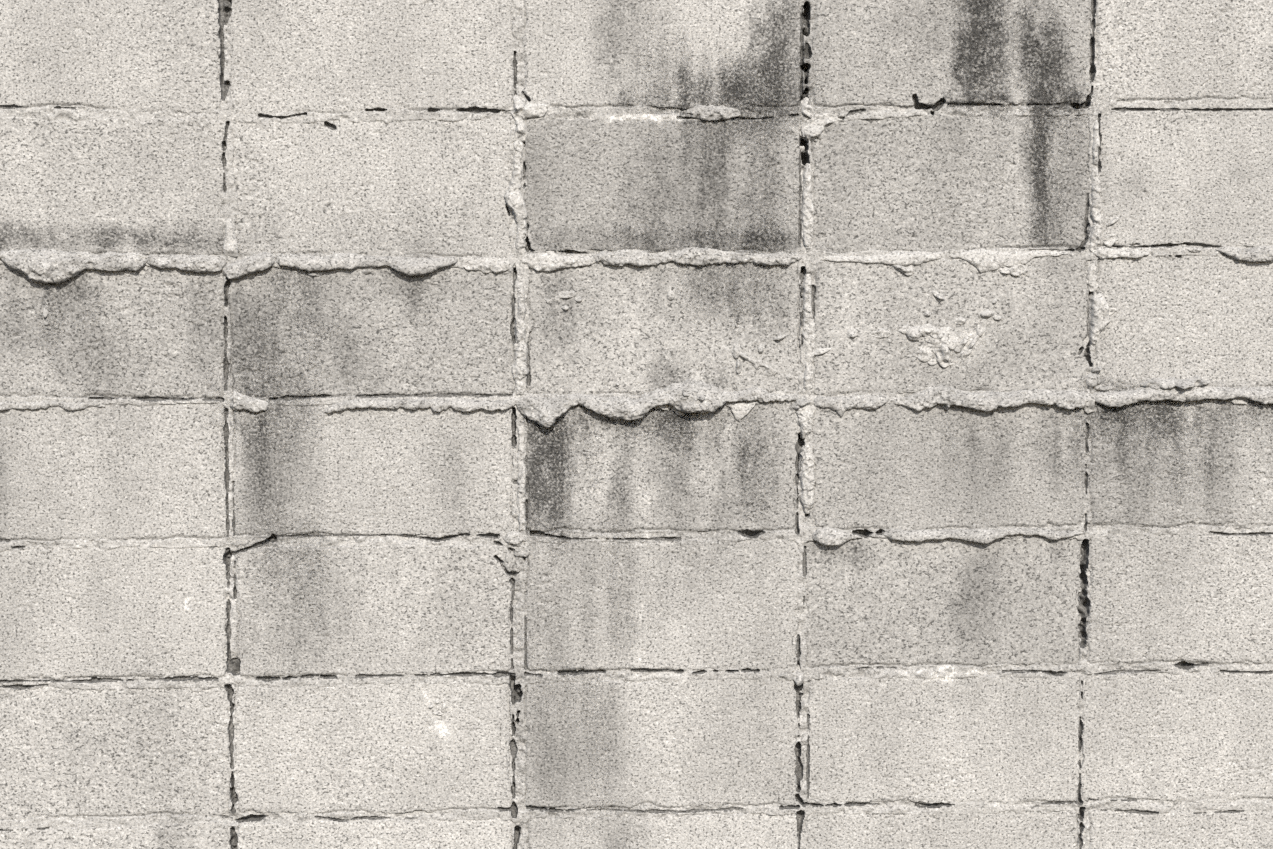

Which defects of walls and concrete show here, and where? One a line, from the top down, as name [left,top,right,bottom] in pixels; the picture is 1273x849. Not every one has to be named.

water stain [606,3,796,123]
water stain [954,0,1010,106]
water stain [1020,13,1080,237]
water stain [526,420,568,532]